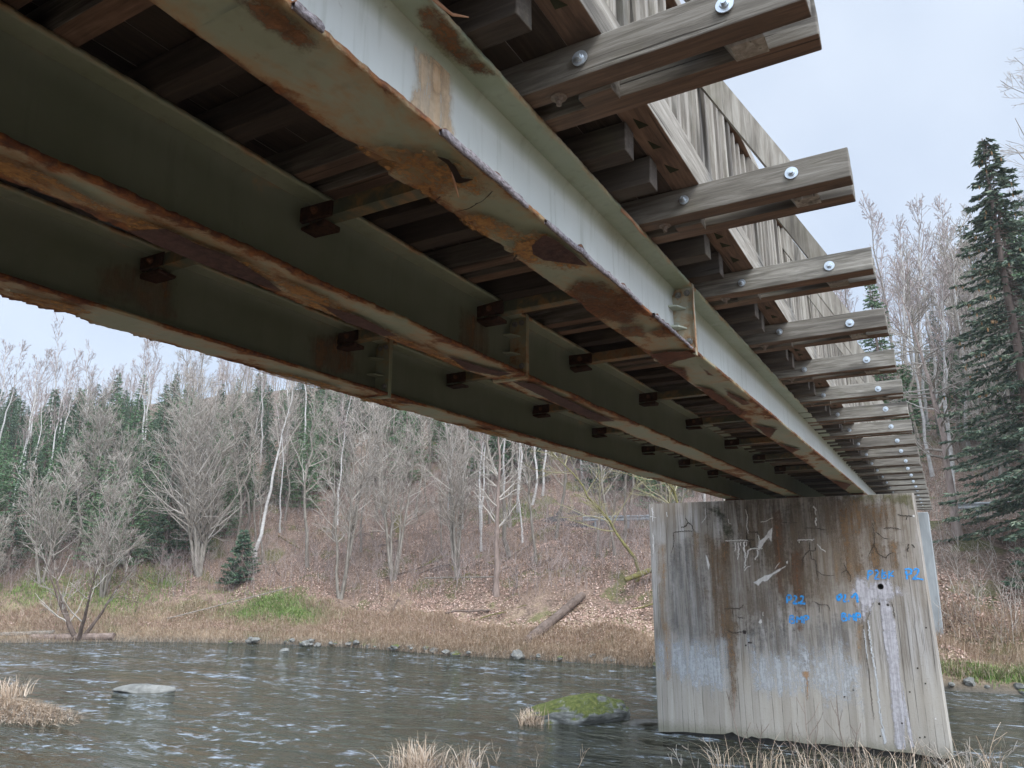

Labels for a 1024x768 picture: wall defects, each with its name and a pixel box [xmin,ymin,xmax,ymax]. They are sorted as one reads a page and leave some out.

corrosion [236,0,325,48]
corrosion [419,0,495,75]
corrosion [355,49,529,209]
corrosion [0,157,159,230]
corrosion [10,292,90,314]
corrosion [462,214,749,415]
corrosion [255,370,340,390]
corrosion [351,395,409,406]
corrosion [382,328,614,422]
crack [781,514,915,612]
leakage [752,579,914,749]